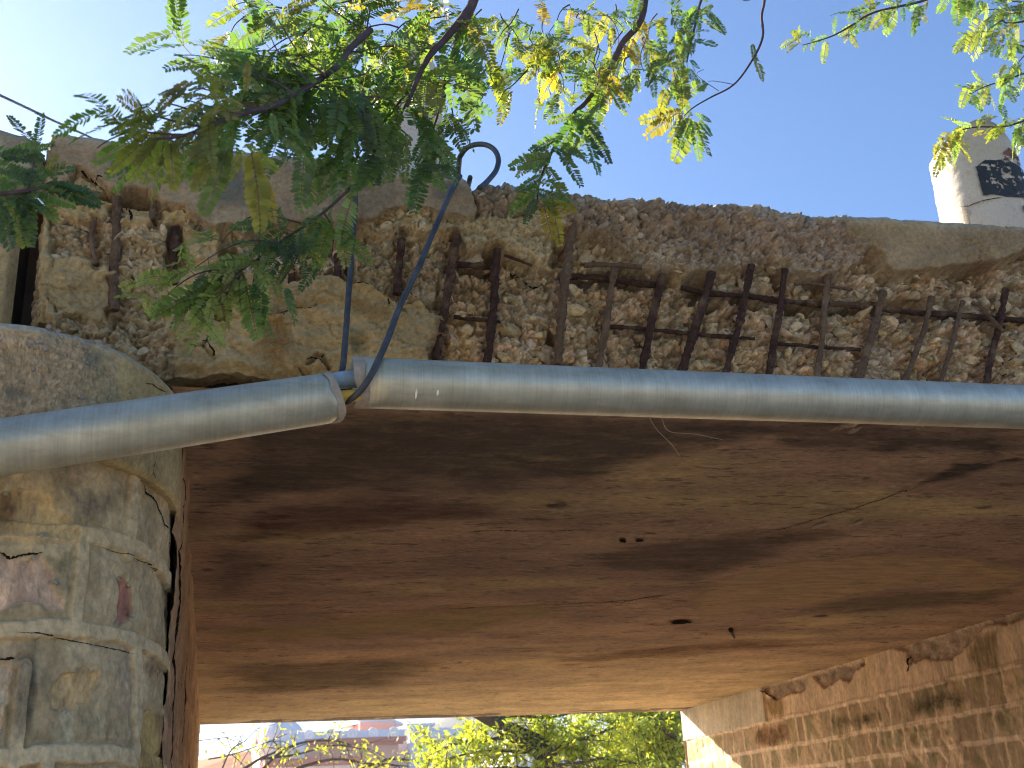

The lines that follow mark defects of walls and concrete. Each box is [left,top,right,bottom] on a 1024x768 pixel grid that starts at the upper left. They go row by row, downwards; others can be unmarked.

spalling [0,168,1024,418]
crack [0,552,43,560]
crack [19,632,137,654]
crack [107,457,190,768]
spalling [895,611,1024,664]
spalling [761,658,865,701]